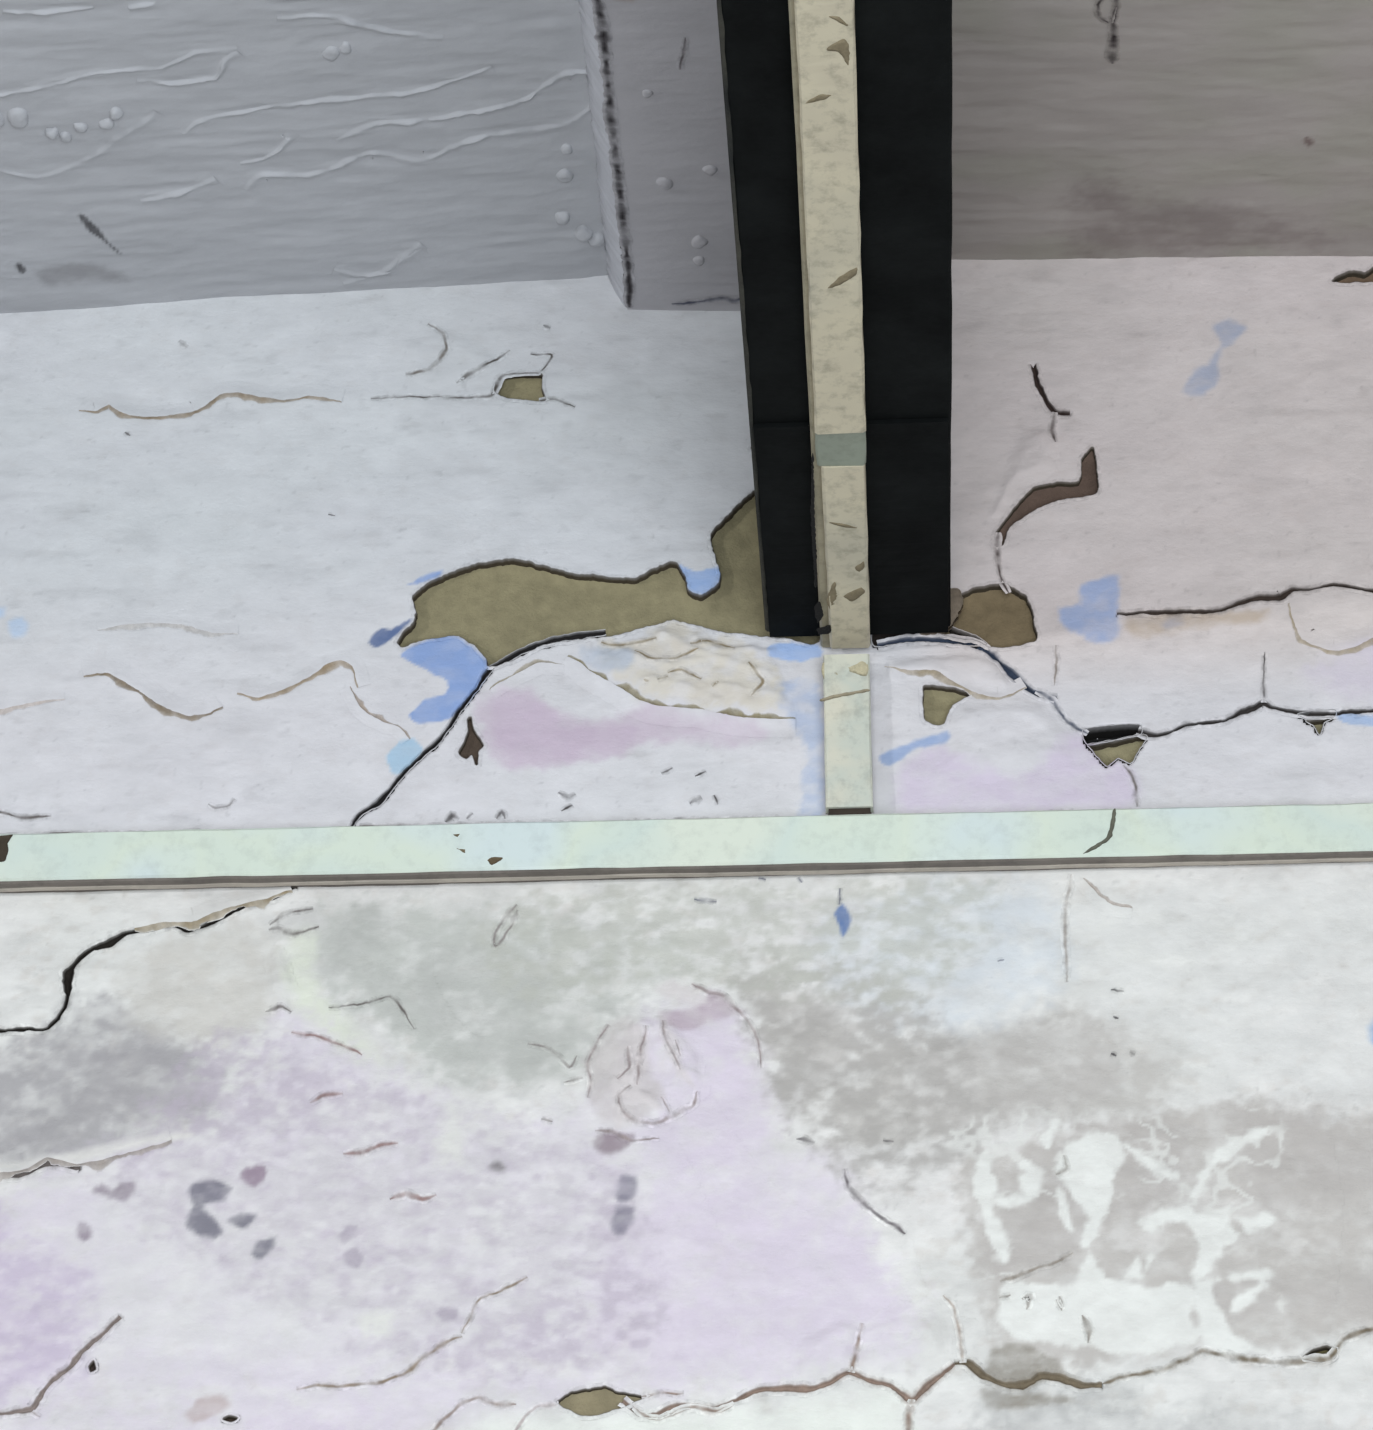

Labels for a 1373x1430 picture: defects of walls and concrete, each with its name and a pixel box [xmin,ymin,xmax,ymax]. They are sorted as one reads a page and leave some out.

spalling [1328,264,1373,286]
spalling [491,369,549,405]
spalling [990,444,1103,549]
peeling [81,658,223,722]
spalling [237,487,833,816]
crack [350,629,768,826]
crack [876,633,1089,736]
crack [1116,580,1373,619]
crack [0,887,320,1037]
water stain [0,862,1373,1430]
crack [0,1312,125,1420]
crack [618,1293,1373,1430]